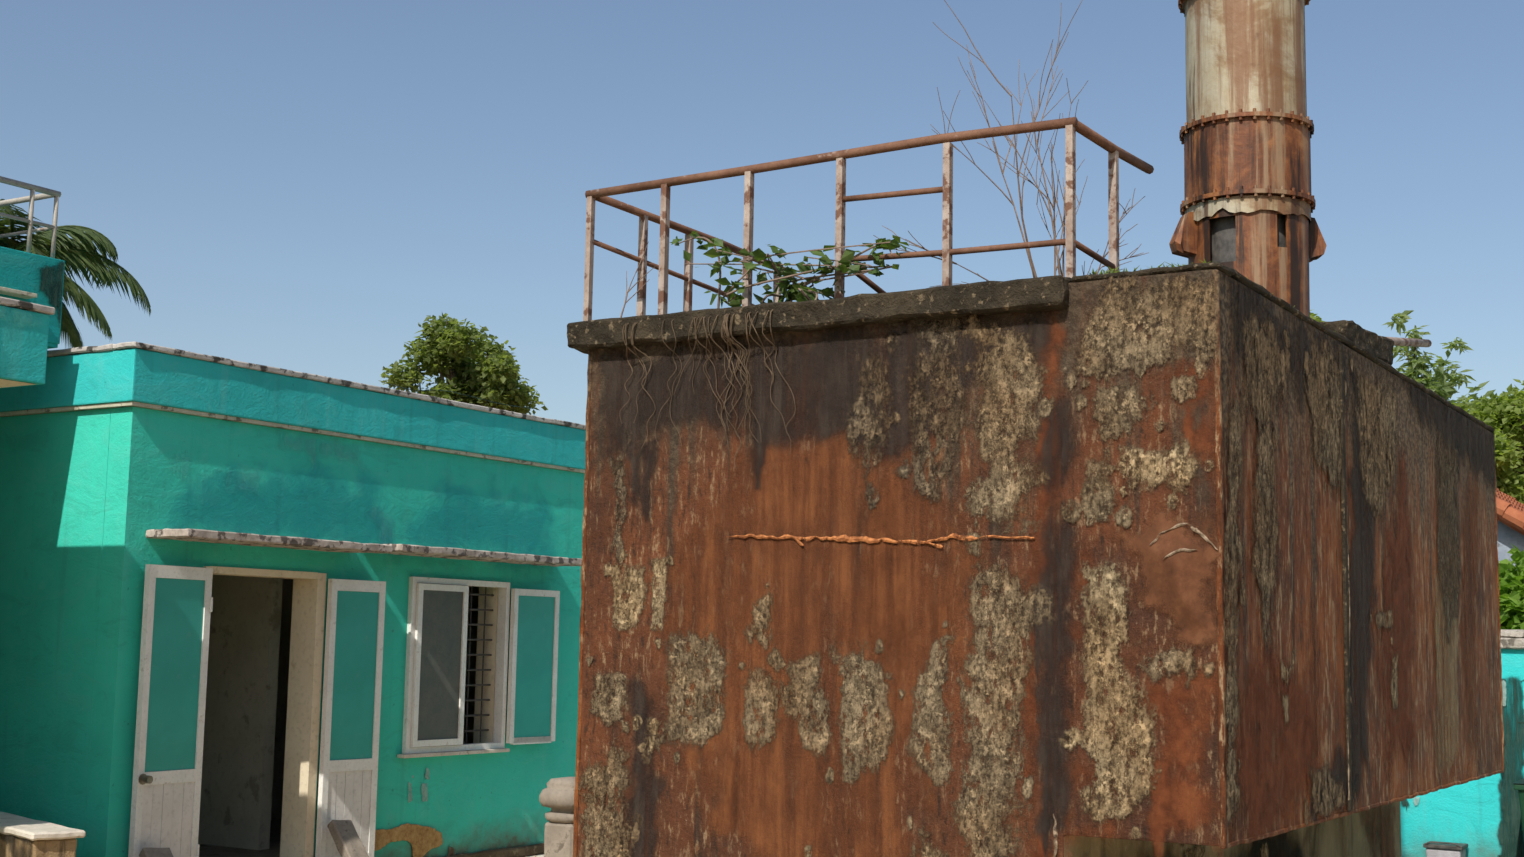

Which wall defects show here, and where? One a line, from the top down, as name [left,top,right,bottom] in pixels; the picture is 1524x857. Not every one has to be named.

corrosion [1170,362,1211,461]
crack [729,533,1034,548]
peeling [578,274,1398,857]
damp [1229,282,1376,822]
corrosion [1379,456,1416,787]
flaking render [374,823,455,857]
peeling [408,768,429,802]
corrosion [1146,648,1318,857]